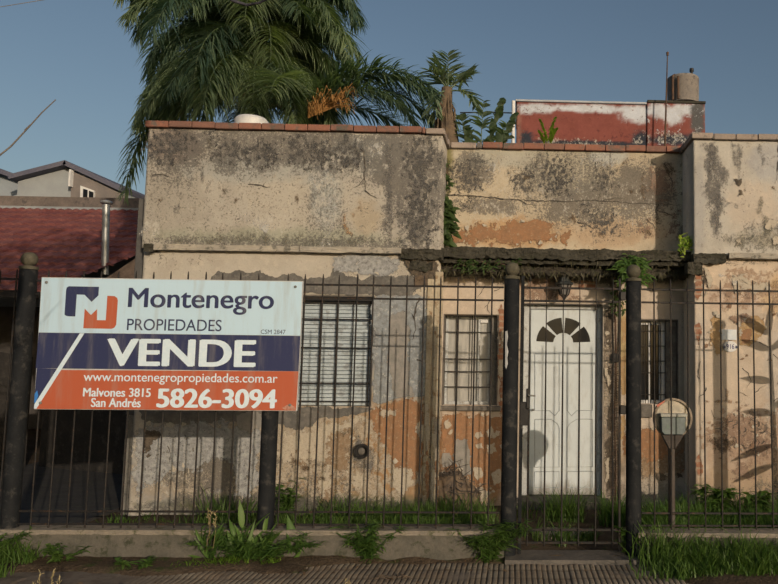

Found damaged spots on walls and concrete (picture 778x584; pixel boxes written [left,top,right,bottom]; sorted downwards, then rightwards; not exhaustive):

leakage [141,128,496,249]
flaking render [452,219,572,248]
crack [446,166,674,232]
leakage [506,151,627,243]
leakage [704,143,728,235]
peeling [694,305,777,360]
flaking render [277,304,504,506]
peeling [130,417,261,499]
flaking render [641,428,685,481]
flaking render [695,454,703,476]